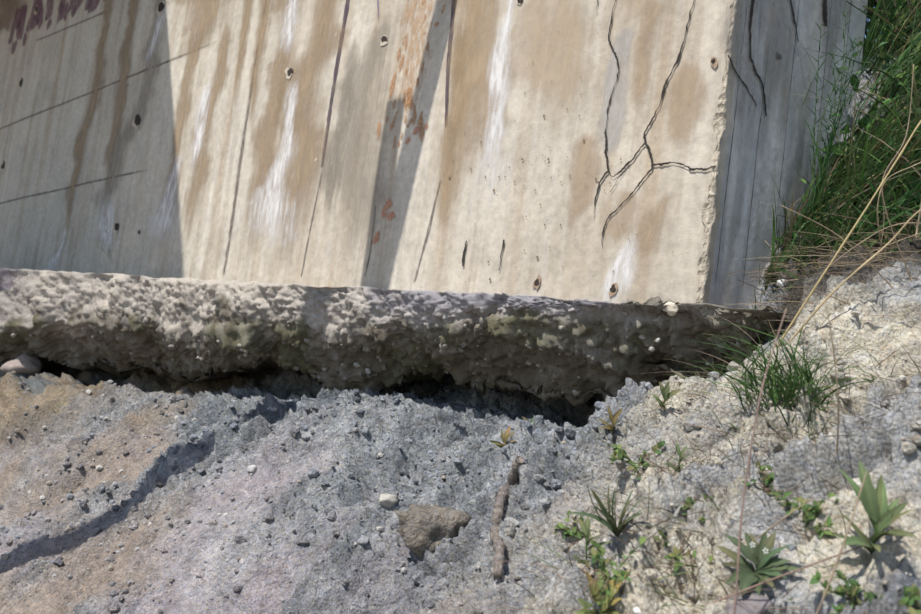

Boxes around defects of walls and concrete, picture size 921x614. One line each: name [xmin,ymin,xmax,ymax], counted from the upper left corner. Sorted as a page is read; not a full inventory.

water stain [67,0,112,216]
water stain [96,0,166,247]
water stain [153,0,385,236]
rust [377,0,445,148]
water stain [441,0,512,215]
crack [593,0,716,242]
spalling [693,0,738,330]
crack [728,0,767,116]
crack [790,0,799,41]
crack [821,0,829,26]
spalling [113,320,311,372]
spalling [311,324,507,388]